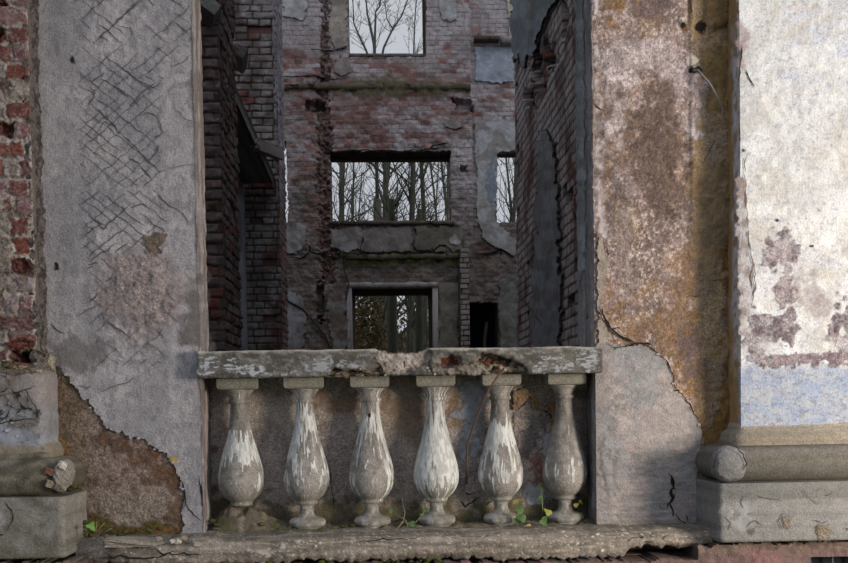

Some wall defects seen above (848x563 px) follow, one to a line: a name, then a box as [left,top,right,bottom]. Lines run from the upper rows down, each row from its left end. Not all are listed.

flaking render [282,0,308,21]
flaking render [329,0,349,50]
flaking render [475,0,559,84]
flaking render [575,0,587,289]
crack [72,0,192,392]
spalling [11,257,33,274]
flaking render [281,119,702,525]
crack [0,372,40,424]
peeling [198,356,268,376]
spalling [44,366,203,549]
peeling [218,421,264,491]
crack [667,473,689,524]